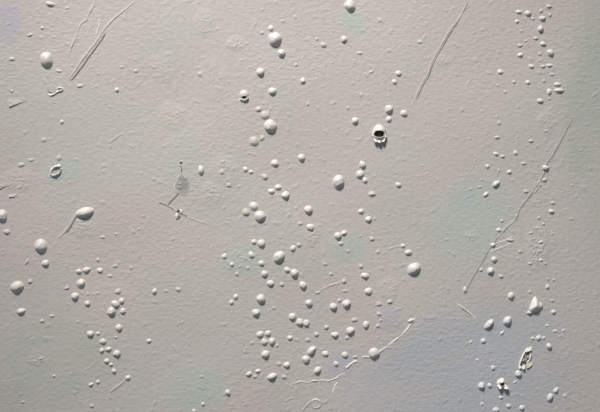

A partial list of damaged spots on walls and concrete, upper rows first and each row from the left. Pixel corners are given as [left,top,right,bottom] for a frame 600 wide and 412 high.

crack [66,0,136,81]
crack [407,0,469,112]
crack [456,118,574,323]
peeling [526,297,543,315]
spalling [518,346,533,369]